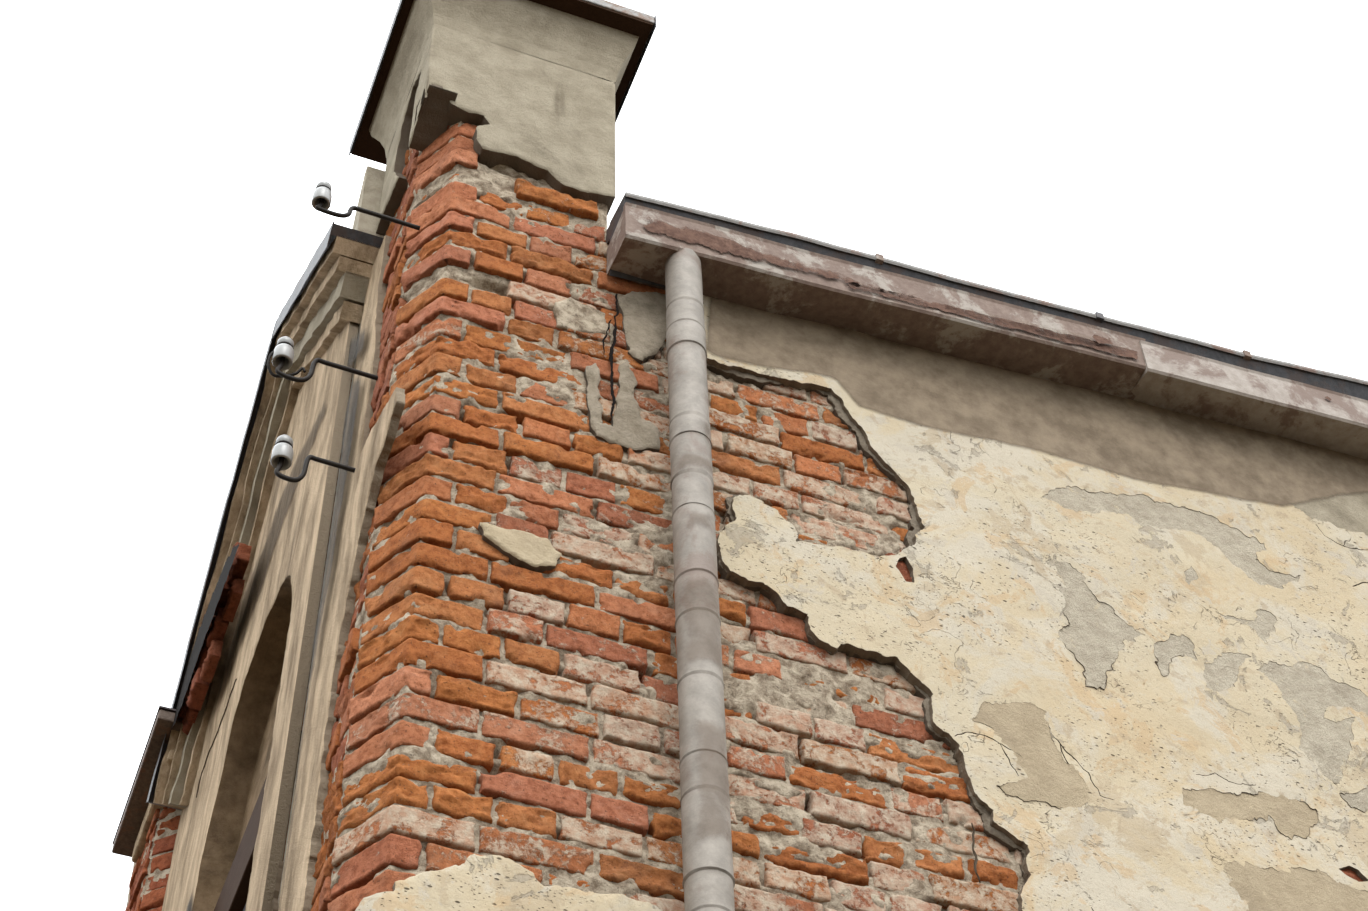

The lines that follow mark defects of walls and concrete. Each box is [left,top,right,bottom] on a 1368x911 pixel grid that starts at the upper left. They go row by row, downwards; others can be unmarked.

spalling [311,121,685,911]
spalling [707,369,912,582]
spalling [170,542,252,735]
spalling [125,807,182,911]
spalling [718,571,1024,911]
peeling [972,702,1094,809]
peeling [1182,788,1319,840]
peeling [1224,861,1368,911]